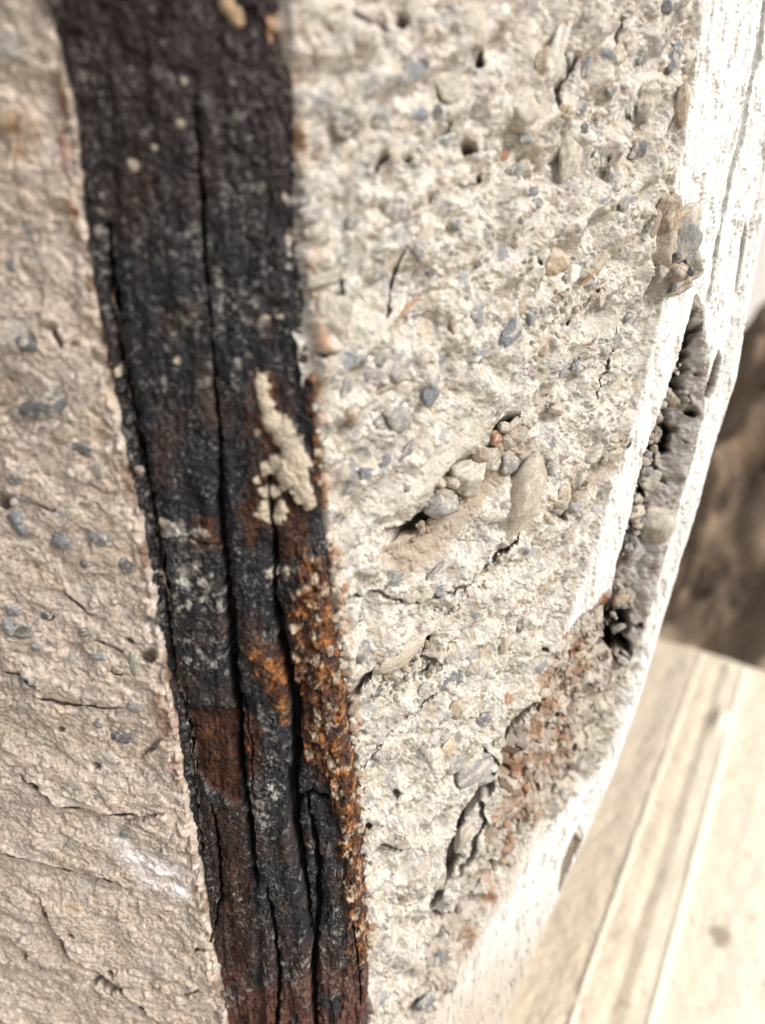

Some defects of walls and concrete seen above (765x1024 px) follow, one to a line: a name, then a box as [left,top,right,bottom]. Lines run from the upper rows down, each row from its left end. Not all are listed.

corrosion [57,85,68,118]
peeling [704,352,722,400]
spalling [0,0,230,1024]
corrosion [191,515,229,552]
spalling [264,0,699,1024]
corrosion [593,589,612,615]
corrosion [236,367,369,976]
corrosion [499,636,590,830]
corrosion [150,693,263,972]
corrosion [500,832,514,859]
corrosion [479,870,500,911]
corrosion [455,921,480,958]